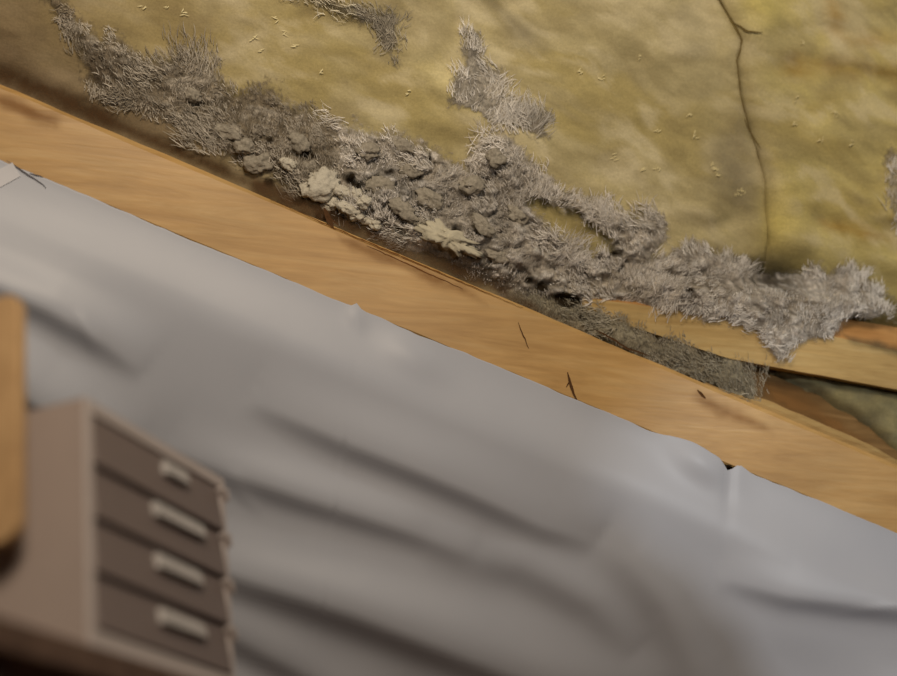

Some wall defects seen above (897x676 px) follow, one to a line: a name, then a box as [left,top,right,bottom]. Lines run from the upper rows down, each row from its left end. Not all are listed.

crack [719,0,762,158]